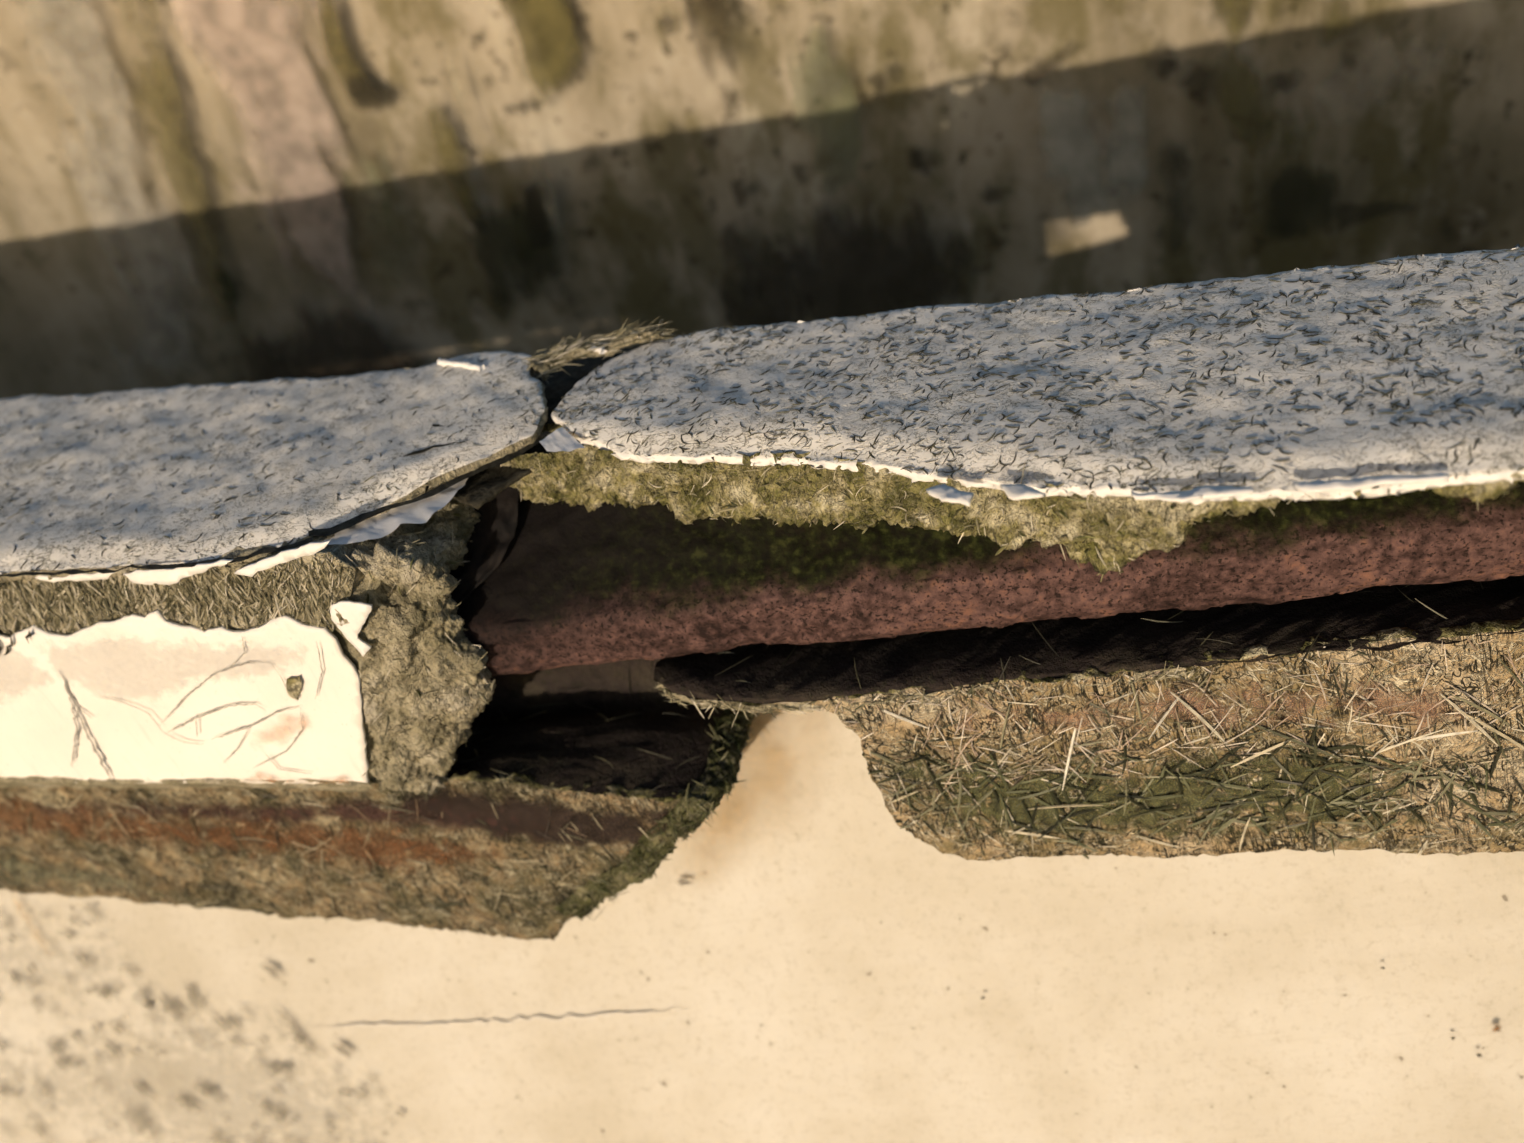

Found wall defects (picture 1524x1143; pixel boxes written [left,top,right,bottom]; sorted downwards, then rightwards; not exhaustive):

leakage [659,0,734,70]
leakage [32,0,238,369]
leakage [174,0,417,382]
leakage [427,108,558,313]
leakage [721,202,969,326]
leakage [1024,55,1147,224]
leakage [1267,163,1415,239]
crack [0,316,676,577]
spalling [501,423,1524,575]
spalling [0,478,497,795]